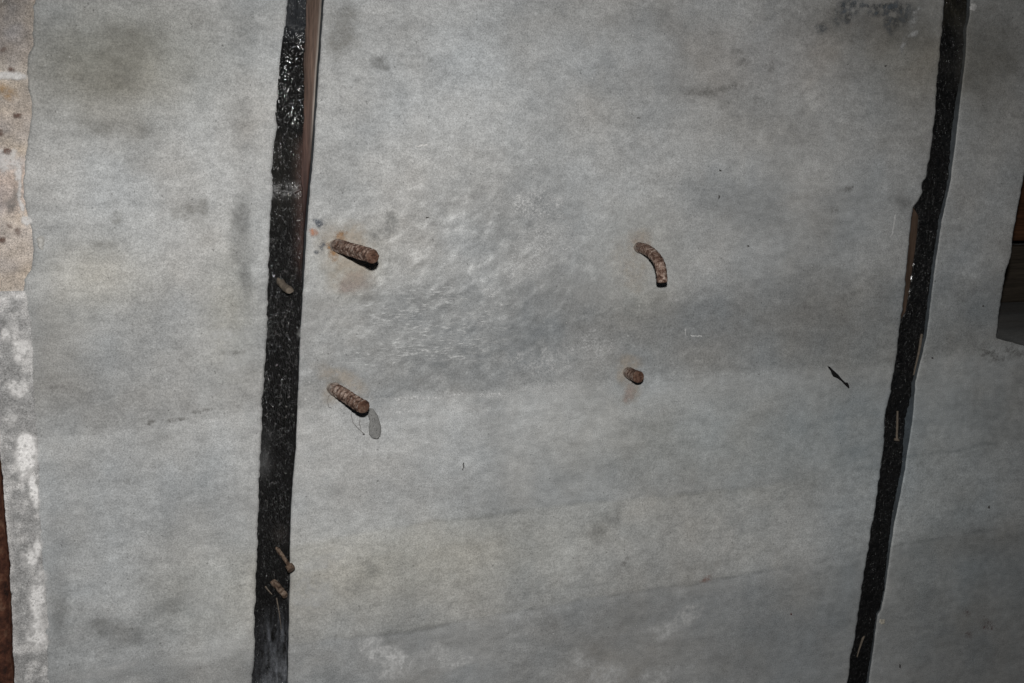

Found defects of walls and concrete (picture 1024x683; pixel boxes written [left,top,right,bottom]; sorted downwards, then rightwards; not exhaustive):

rust [328,229,368,290]